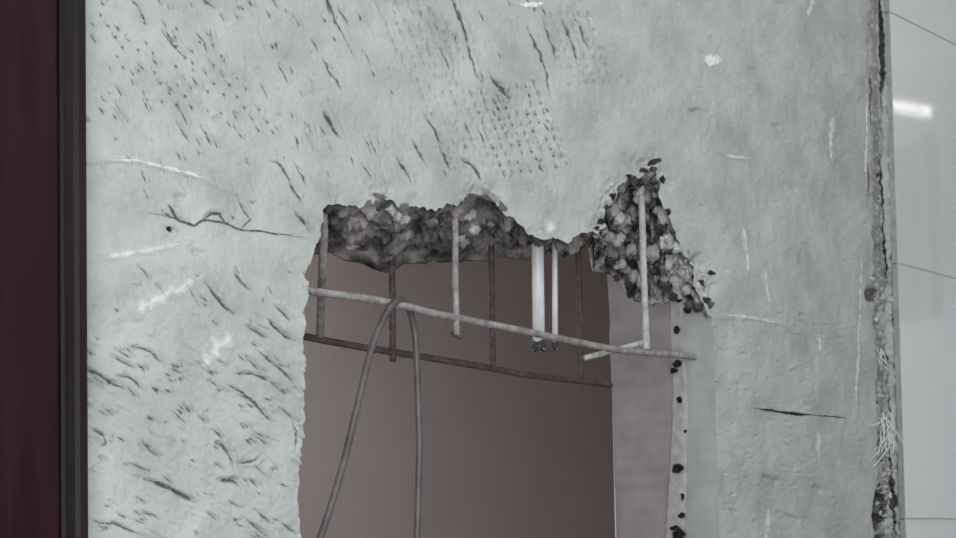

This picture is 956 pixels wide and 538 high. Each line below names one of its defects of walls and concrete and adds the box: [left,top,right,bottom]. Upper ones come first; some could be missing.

crack [869,0,886,124]
crack [158,206,291,236]
spalling [298,158,716,388]
crack [866,159,888,278]
crack [756,408,843,418]